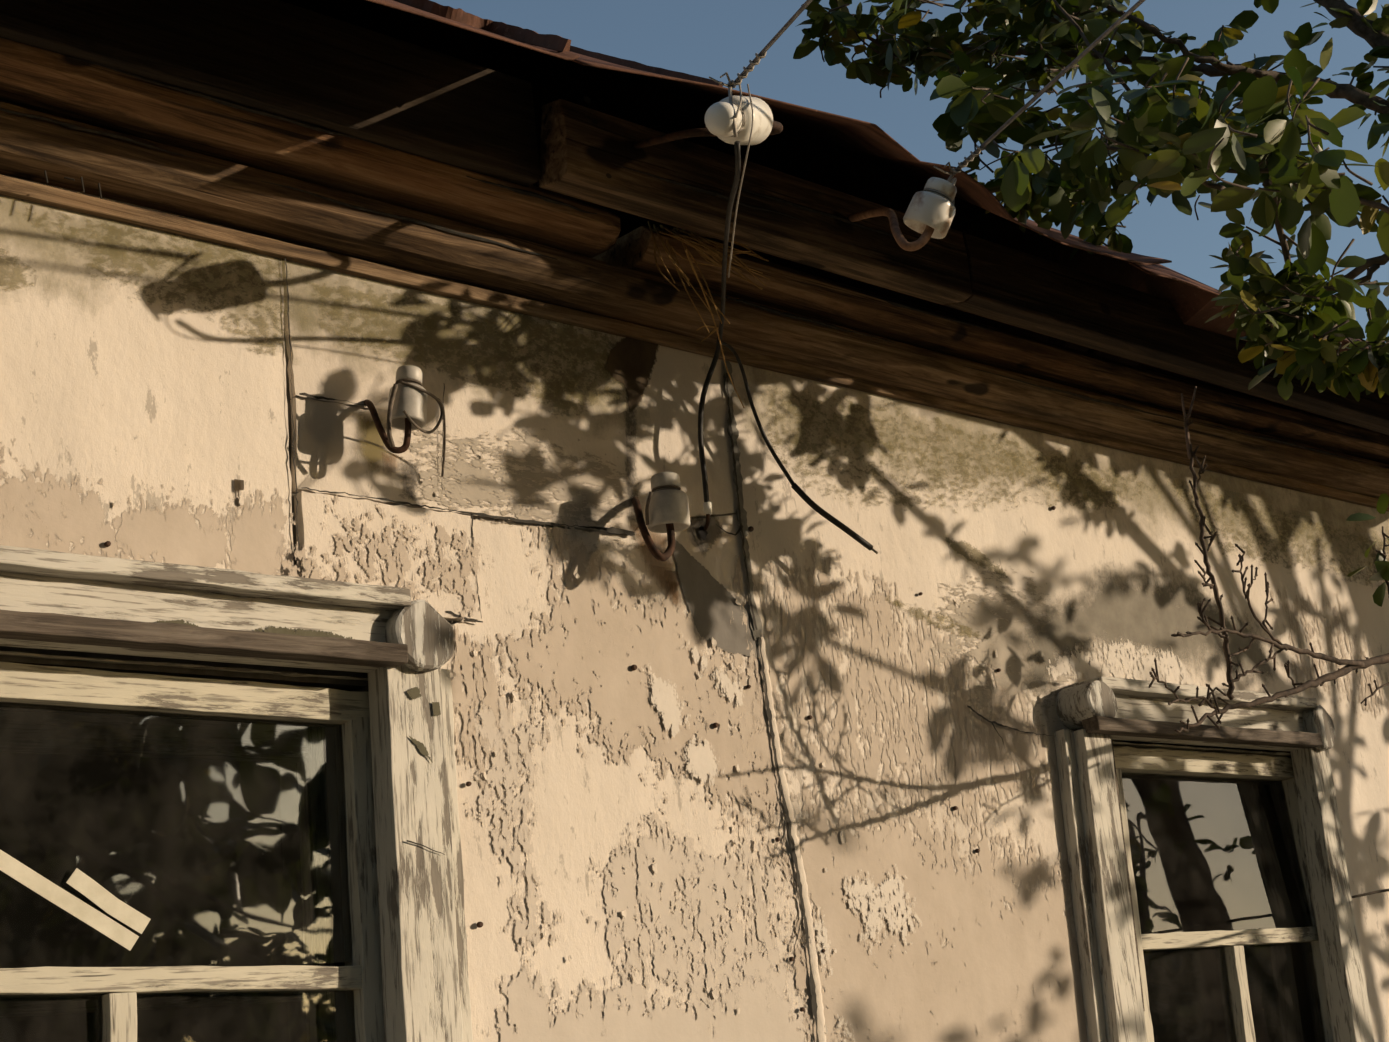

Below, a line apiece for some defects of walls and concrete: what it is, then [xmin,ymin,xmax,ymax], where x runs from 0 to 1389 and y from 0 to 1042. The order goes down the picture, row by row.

water stain [0,196,287,354]
crack [285,258,635,623]
water stain [308,279,659,519]
water stain [757,380,1389,582]
peeling [0,426,1088,1042]
crack [716,361,819,1042]
water stain [1028,576,1275,692]